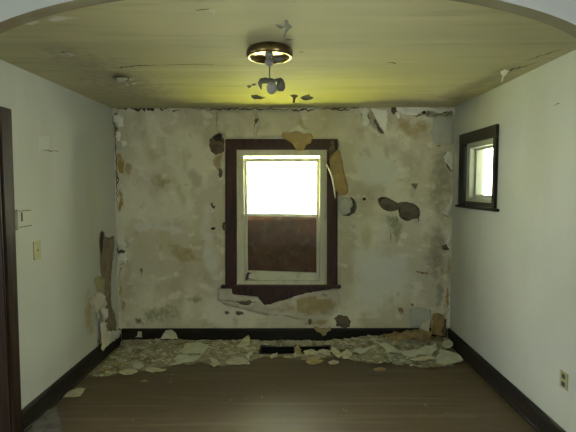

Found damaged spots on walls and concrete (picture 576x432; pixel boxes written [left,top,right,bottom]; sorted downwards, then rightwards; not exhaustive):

flaking render [412,110,455,119]
spalling [209,132,225,182]
crack [113,107,359,209]
spalling [378,197,420,221]
water stain [161,234,206,273]
spalling [95,231,125,342]
water stain [132,292,203,328]
water stain [262,291,340,327]
spalling [334,315,351,328]